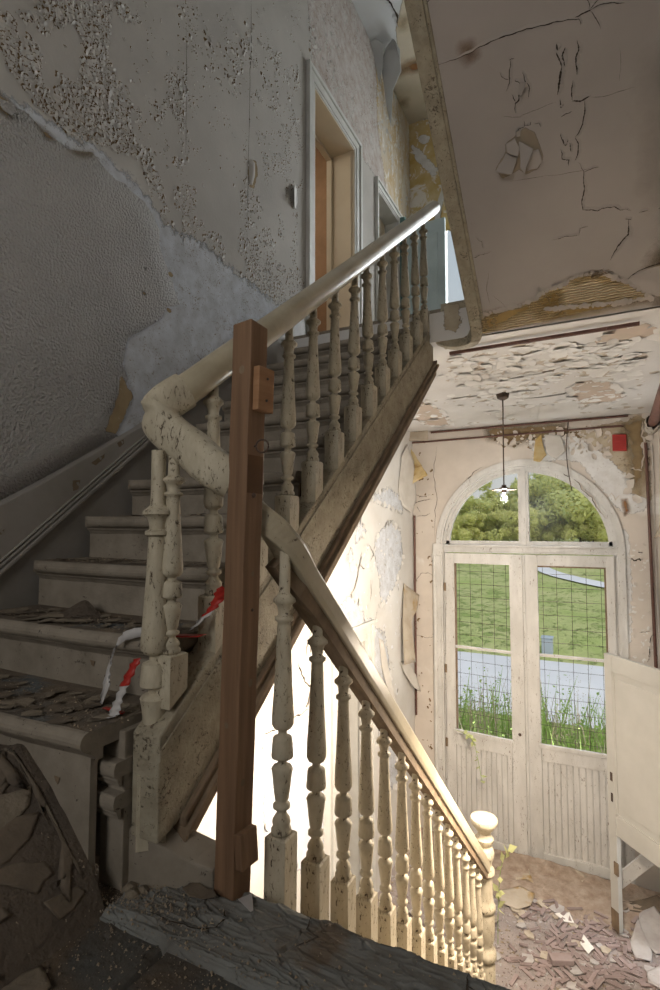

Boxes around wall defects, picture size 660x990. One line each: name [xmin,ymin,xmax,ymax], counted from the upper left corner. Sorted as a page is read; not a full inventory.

flaking render [0,0,438,447]
peeling [496,128,543,178]
crack [438,0,660,261]
peeling [413,321,660,514]
peeling [340,485,434,695]
peeling [388,746,398,791]